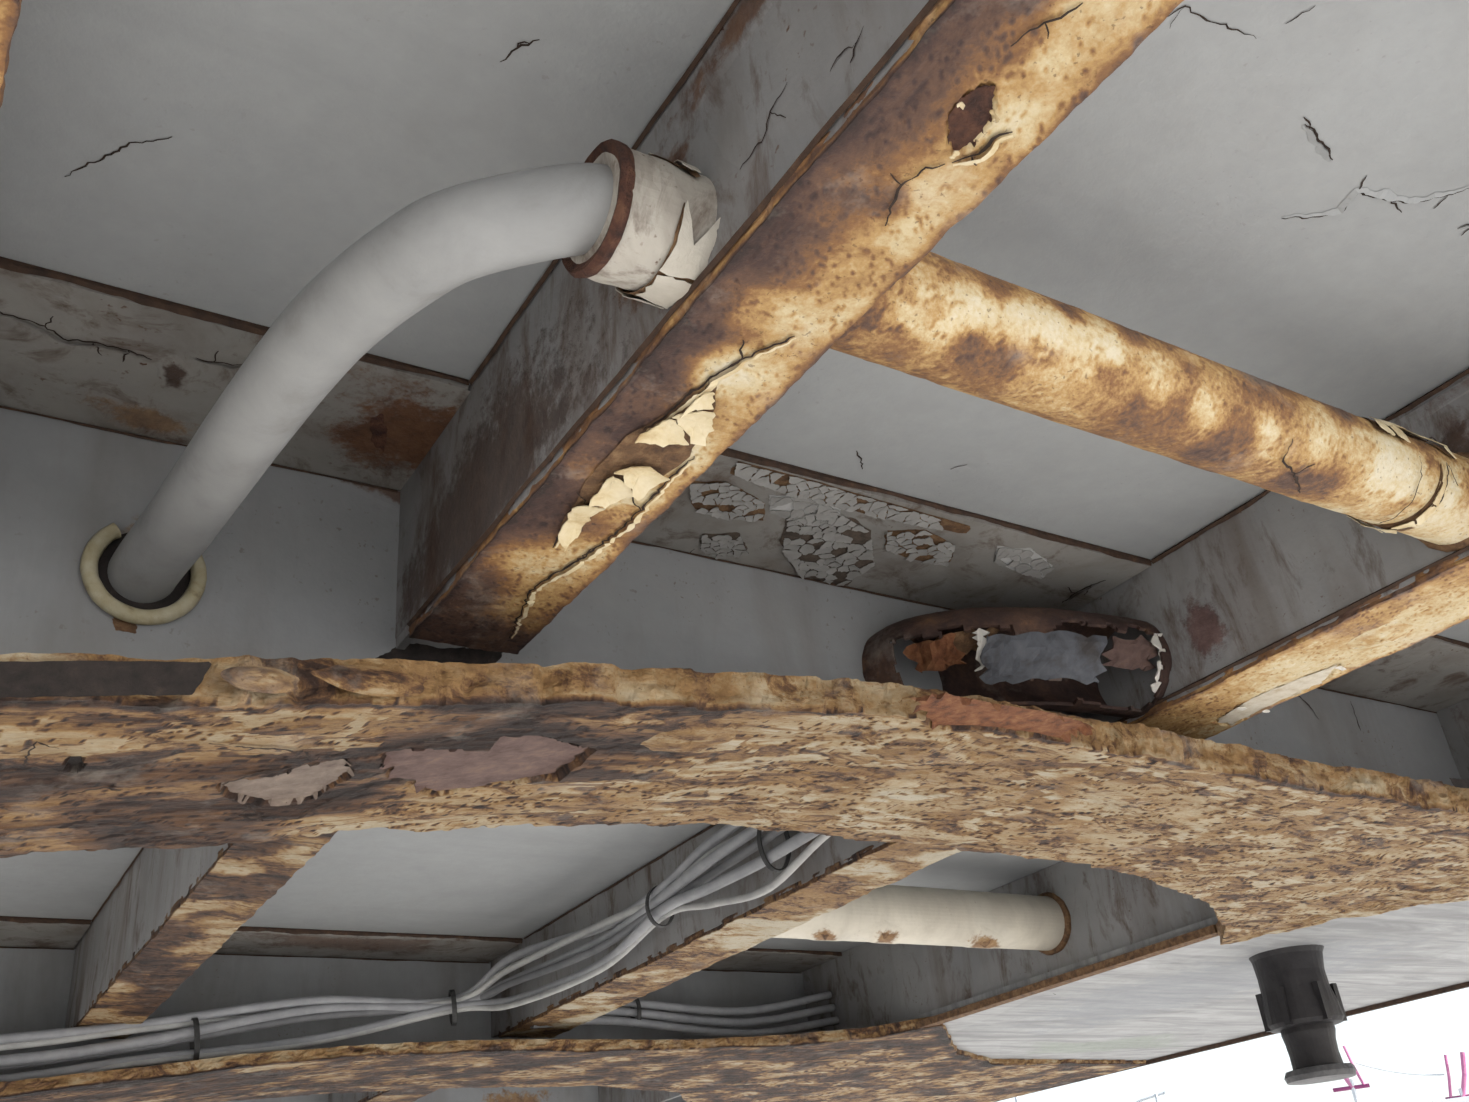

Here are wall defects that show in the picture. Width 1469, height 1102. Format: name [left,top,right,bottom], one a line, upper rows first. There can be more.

crack [500,39,540,62]
crack [64,136,172,177]
crack [1302,117,1333,162]
crack [1282,176,1469,235]
corrosion [220,0,775,697]
corrosion [1392,374,1469,453]
peeling [558,386,717,552]
peeling [689,461,971,586]
spalling [220,759,354,806]
spalling [380,736,587,794]
corrosion [868,920,904,944]
corrosion [958,925,1010,949]